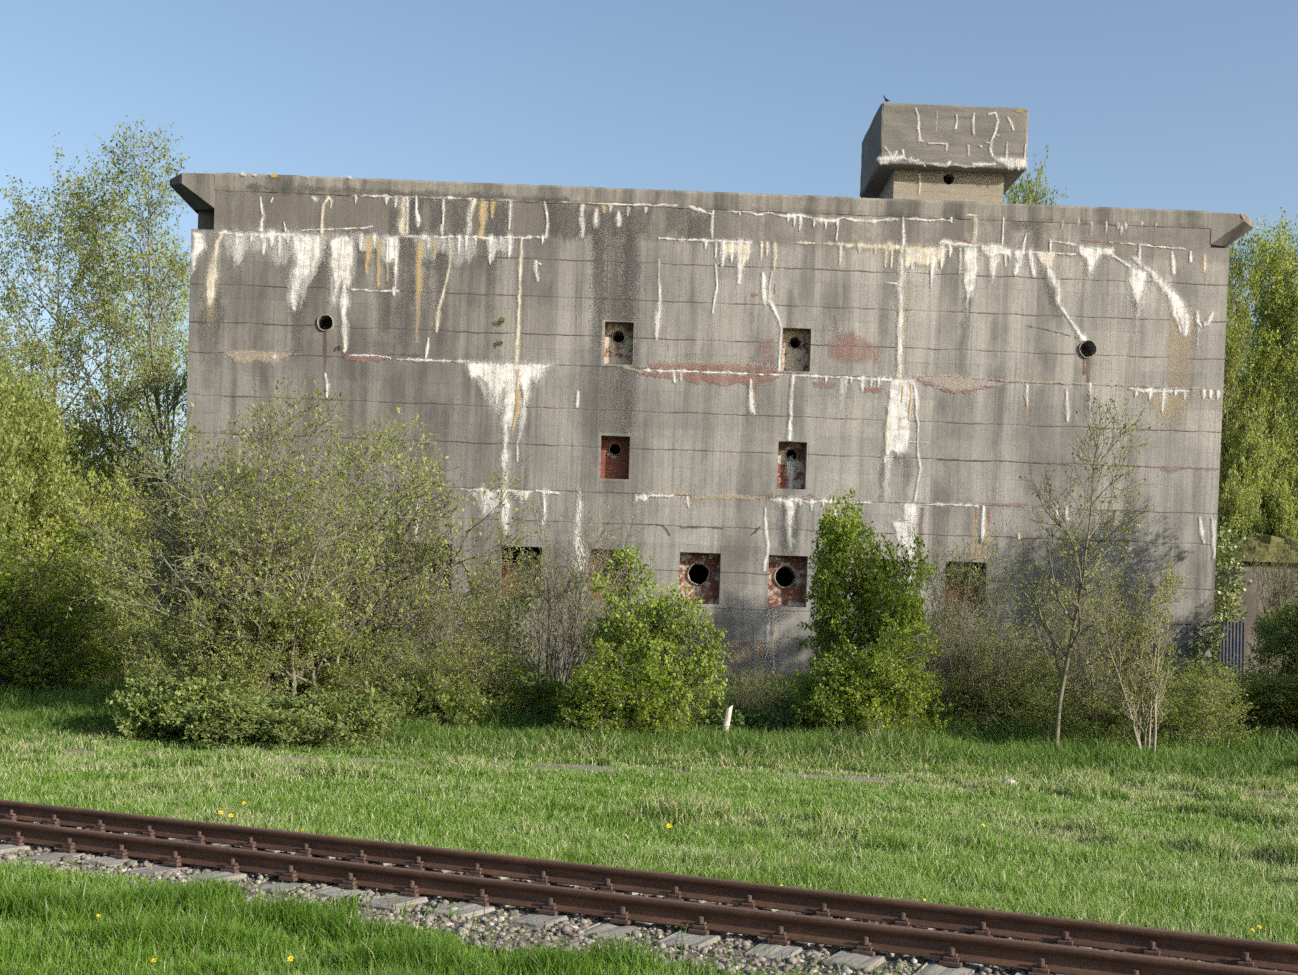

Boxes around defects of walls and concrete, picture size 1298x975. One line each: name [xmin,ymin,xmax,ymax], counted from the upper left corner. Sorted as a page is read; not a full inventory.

water stain [878,113,1026,194]
water stain [731,211,1214,336]
water stain [191,174,915,534]
water stain [1128,388,1220,413]
water stain [574,488,589,609]
water stain [763,458,872,572]
water stain [891,502,991,589]